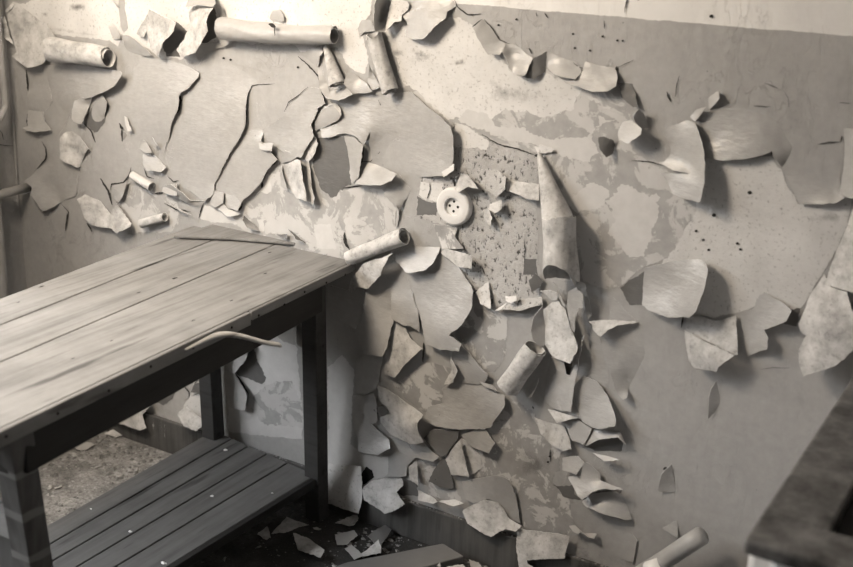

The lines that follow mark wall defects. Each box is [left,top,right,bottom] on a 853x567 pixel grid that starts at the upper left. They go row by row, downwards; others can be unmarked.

peeling [1,0,457,172]
peeling [24,131,88,211]
peeling [77,44,543,514]
peeling [384,16,853,567]
peeling [257,517,324,558]
peeling [335,530,358,545]
peeling [336,515,358,526]